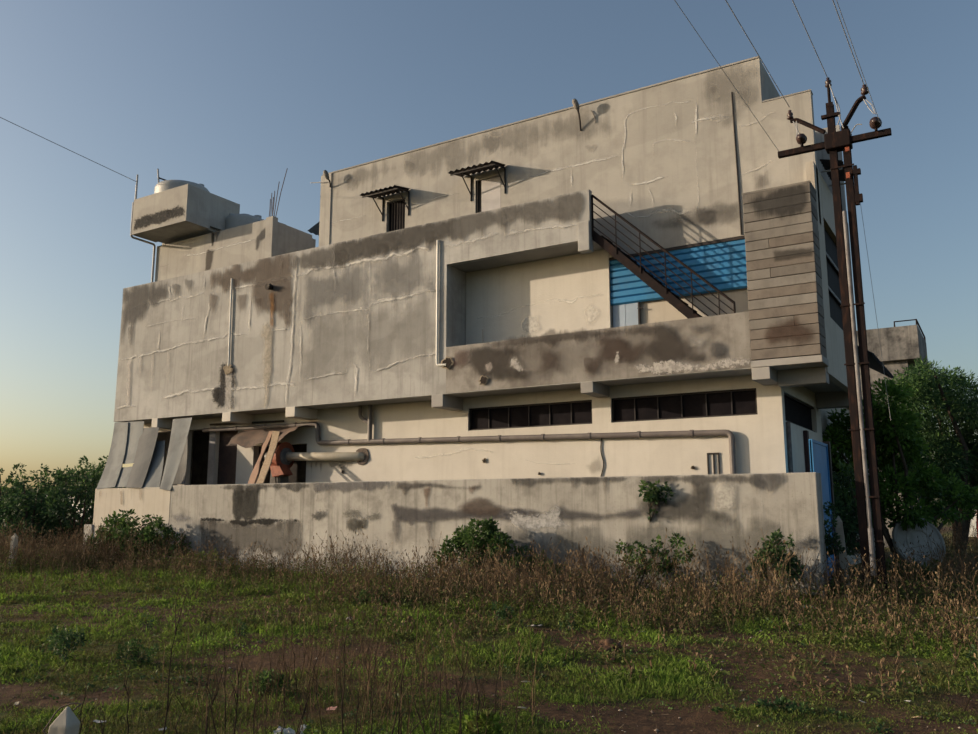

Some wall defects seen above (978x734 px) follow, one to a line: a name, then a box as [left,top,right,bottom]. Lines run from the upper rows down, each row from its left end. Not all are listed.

crack [513,101,723,218]
water stain [134,207,184,229]
water stain [753,185,806,216]
water stain [206,193,582,325]
water stain [123,284,167,328]
crack [121,284,255,360]
crack [163,246,436,403]
water stain [455,318,725,379]
water stain [211,364,235,408]
water stain [201,481,385,526]
water stain [394,486,603,522]
water stain [617,474,783,522]